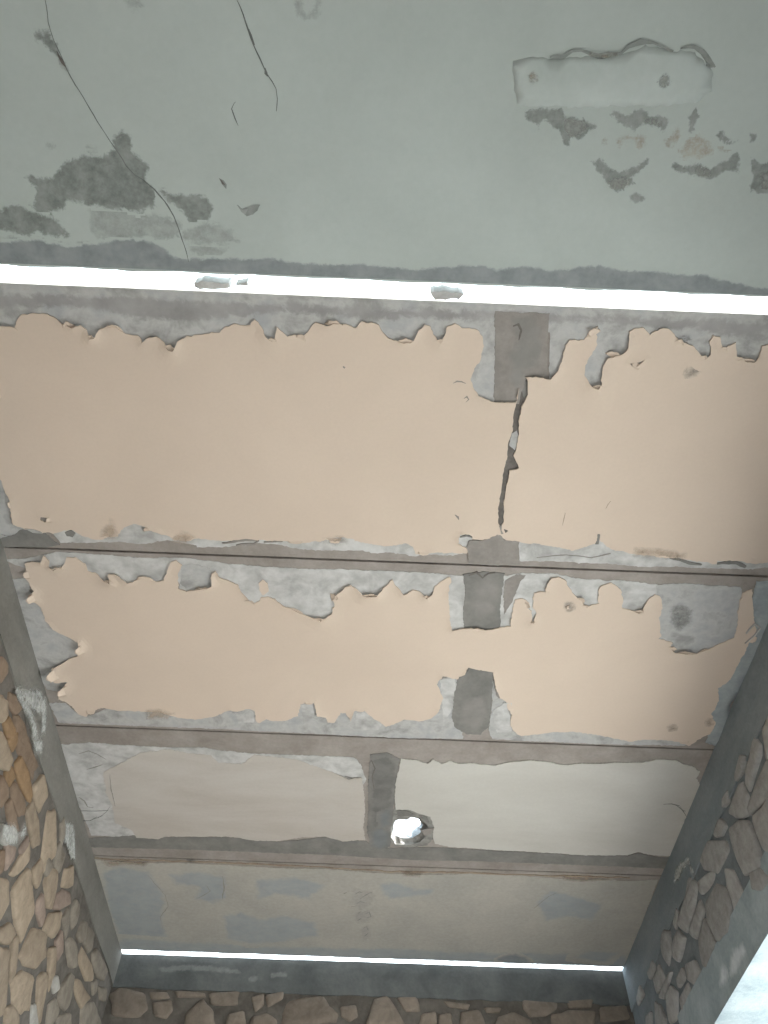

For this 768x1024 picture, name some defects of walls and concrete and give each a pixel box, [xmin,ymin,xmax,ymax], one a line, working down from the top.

crack [237,0,278,111]
crack [32,0,189,262]
damp [0,128,768,295]
peeling [520,104,705,149]
peeling [586,153,653,206]
peeling [667,126,768,197]
peeling [50,315,226,351]
peeling [381,326,446,343]
peeling [454,311,643,404]
crack [498,380,528,534]
peeling [0,480,768,746]
peeling [61,742,434,850]